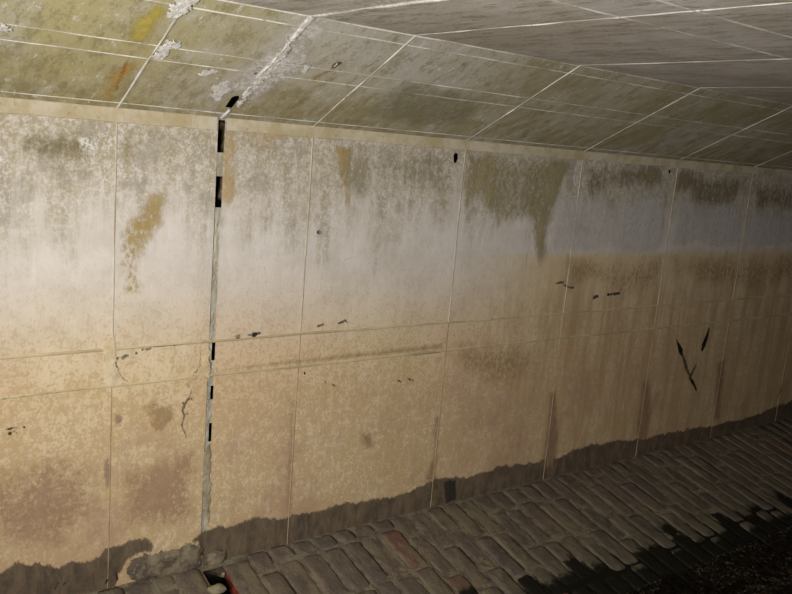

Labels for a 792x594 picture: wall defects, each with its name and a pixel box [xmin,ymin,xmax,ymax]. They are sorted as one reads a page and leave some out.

water stain [131,0,199,41]
water stain [150,39,182,60]
water stain [198,15,326,108]
crack [181,396,192,433]
water stain [0,538,153,594]